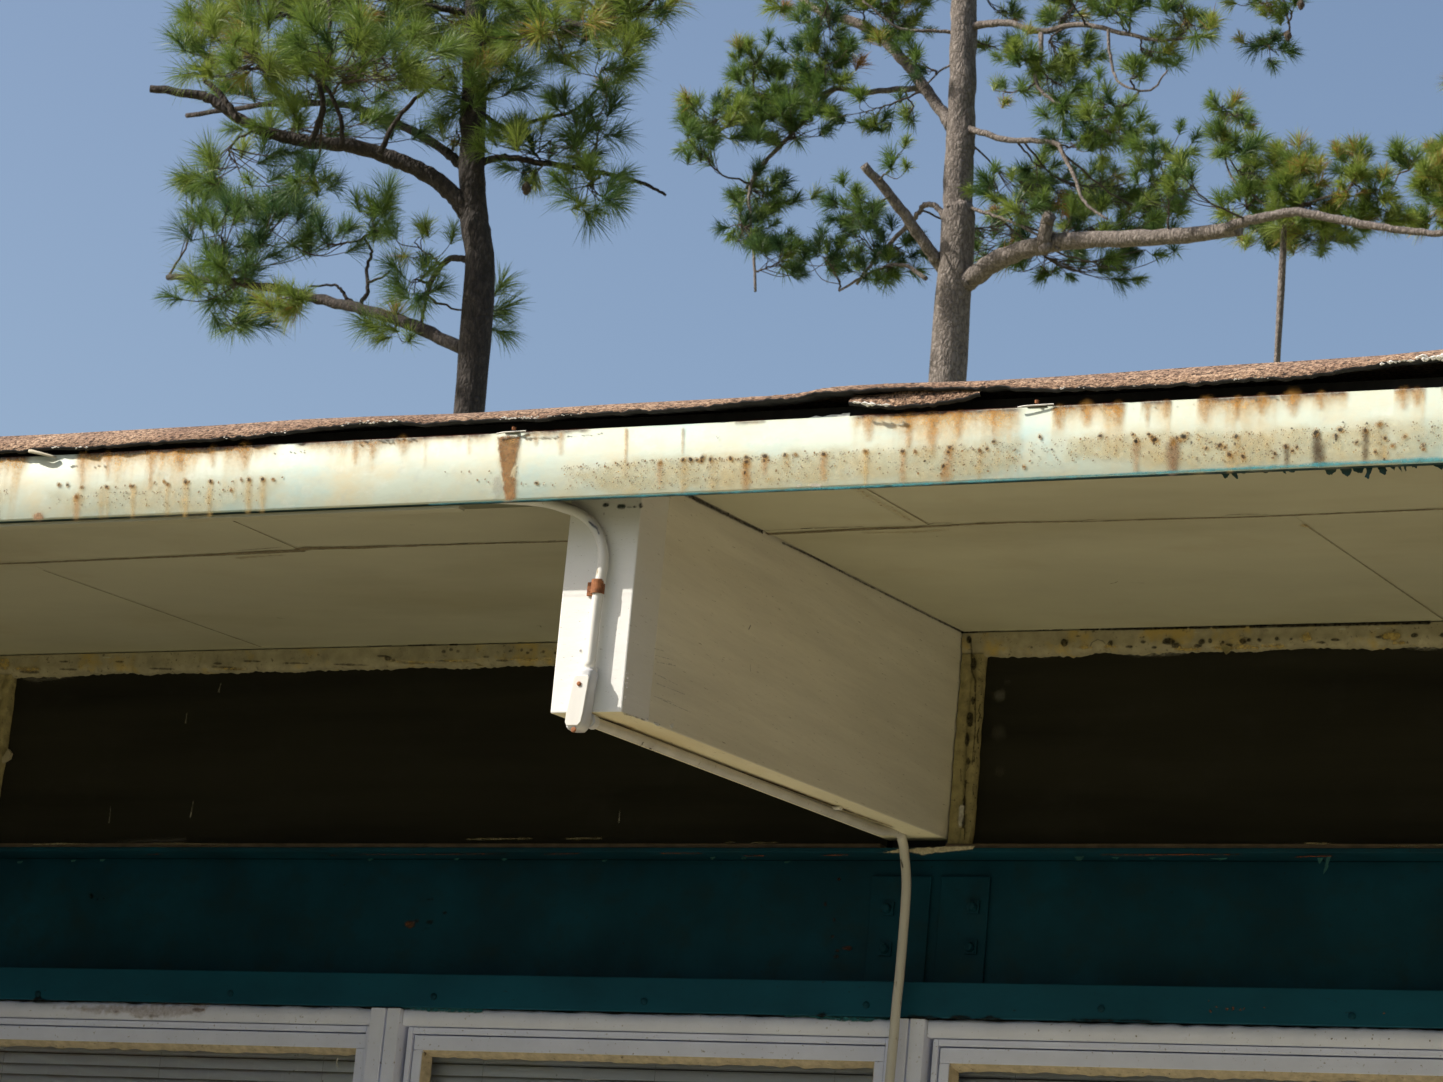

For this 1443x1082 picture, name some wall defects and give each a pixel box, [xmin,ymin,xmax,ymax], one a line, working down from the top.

corrosion [1053,402,1123,419]
corrosion [1198,391,1346,408]
corrosion [856,407,1437,476]
corrosion [0,456,27,468]
corrosion [80,444,271,464]
corrosion [301,428,587,501]
spalling [681,450,825,474]
peeling [722,421,1443,493]